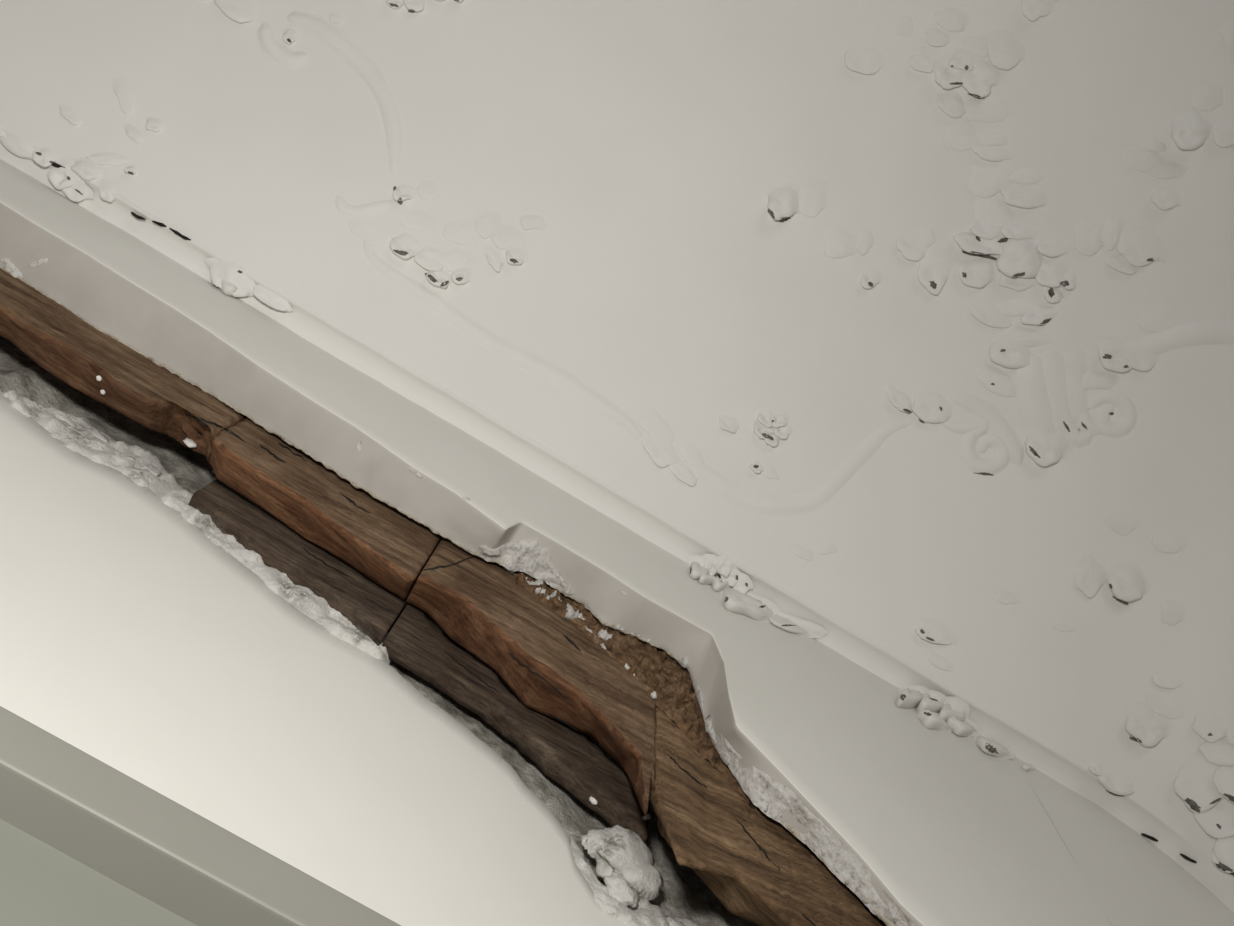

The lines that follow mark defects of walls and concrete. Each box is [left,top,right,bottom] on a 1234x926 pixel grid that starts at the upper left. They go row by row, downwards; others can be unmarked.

crack [423,556,474,571]
flaking render [0,258,916,926]